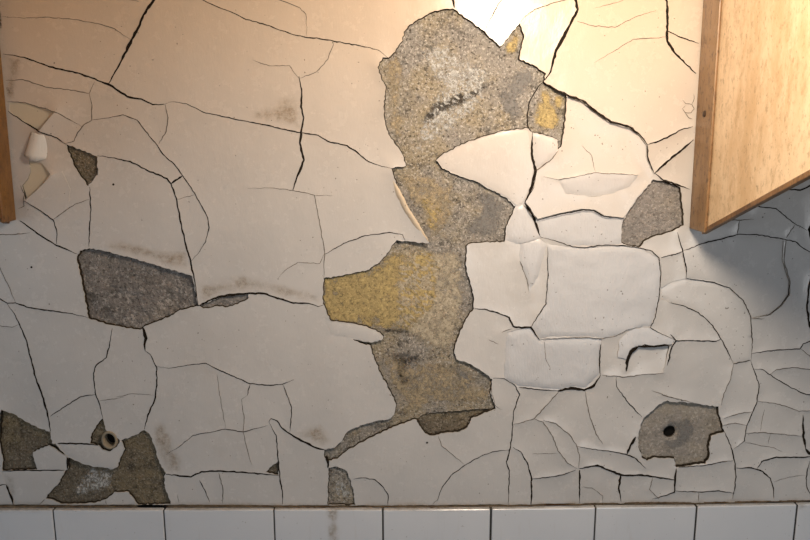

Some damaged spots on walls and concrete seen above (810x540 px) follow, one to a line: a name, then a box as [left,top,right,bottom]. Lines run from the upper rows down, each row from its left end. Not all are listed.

peeling [10,103,98,219]
spalling [77,248,249,330]
crack [0,0,405,307]
spalling [322,9,566,506]
crack [433,0,810,506]
spalling [621,179,684,247]
spalling [0,410,171,505]
crack [0,268,329,504]
spalling [628,401,724,467]